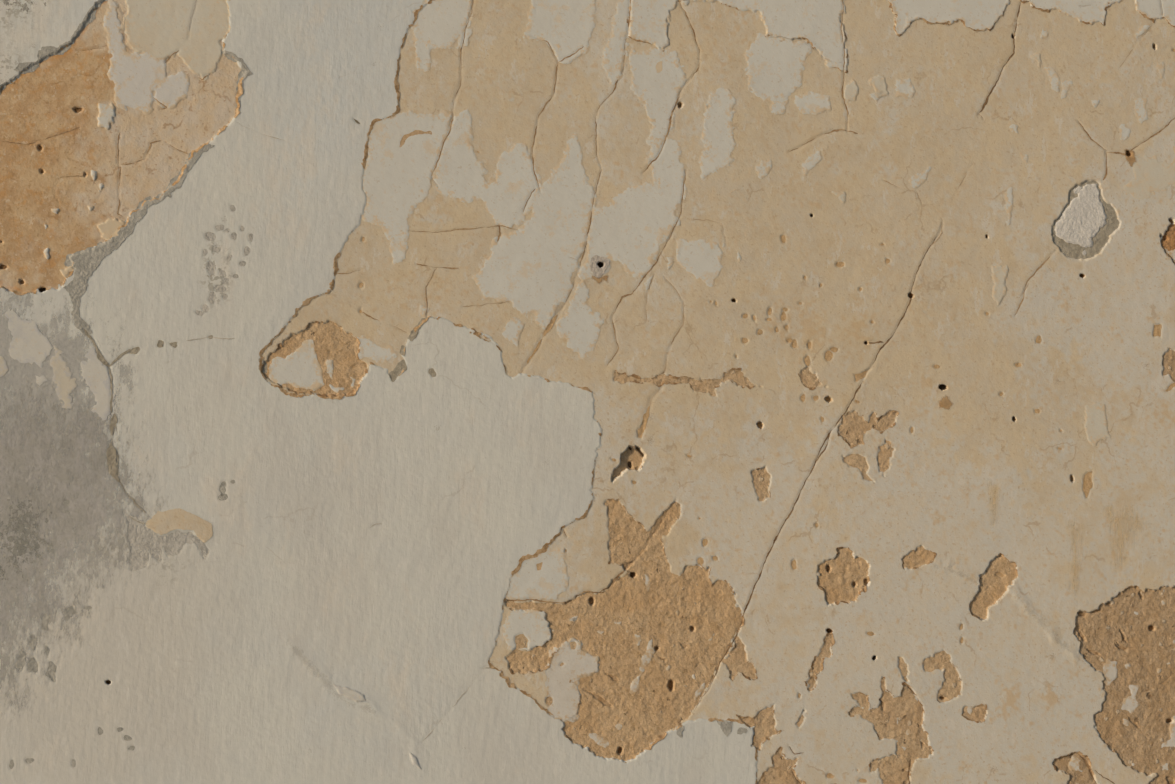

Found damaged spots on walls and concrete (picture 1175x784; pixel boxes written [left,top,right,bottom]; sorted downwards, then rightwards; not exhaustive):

peeling [0,0,253,421]
crack [432,4,473,181]
crack [410,40,584,242]
crack [521,0,653,373]
crack [607,172,726,433]
crack [647,0,700,169]
peeling [258,0,1175,784]
crack [774,0,858,151]
crack [694,227,942,711]
crack [980,3,1021,117]
crack [1015,257,1050,315]
crack [1078,118,1175,180]